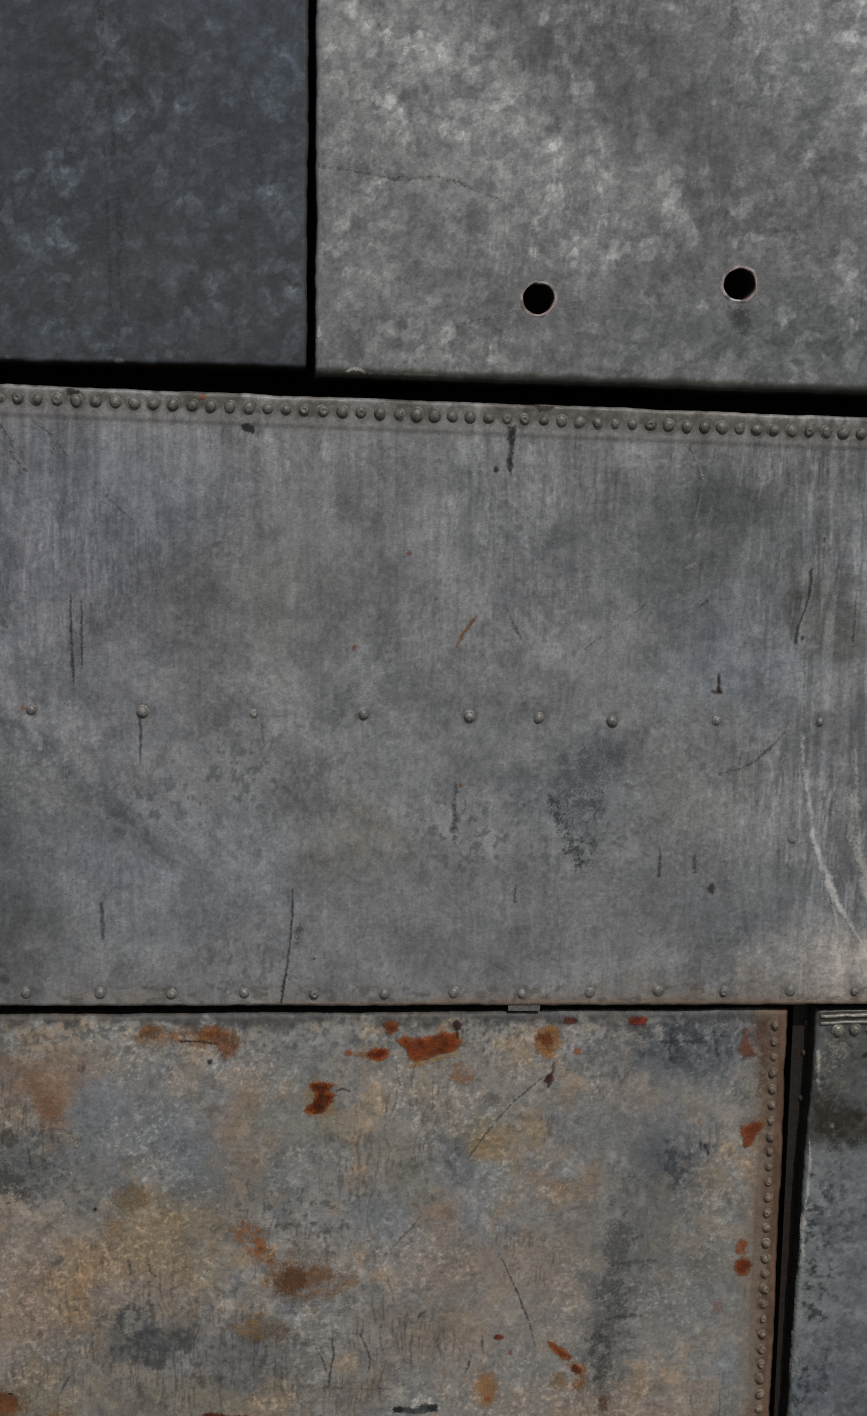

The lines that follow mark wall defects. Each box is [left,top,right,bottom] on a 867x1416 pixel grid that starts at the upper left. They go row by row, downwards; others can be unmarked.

rust [629,1017,648,1025]
rust [135,1023,239,1058]
rust [345,1020,474,1083]
rust [301,1081,350,1115]
rust [740,1118,765,1148]
rust [733,1239,752,1276]
rust [548,1339,587,1393]